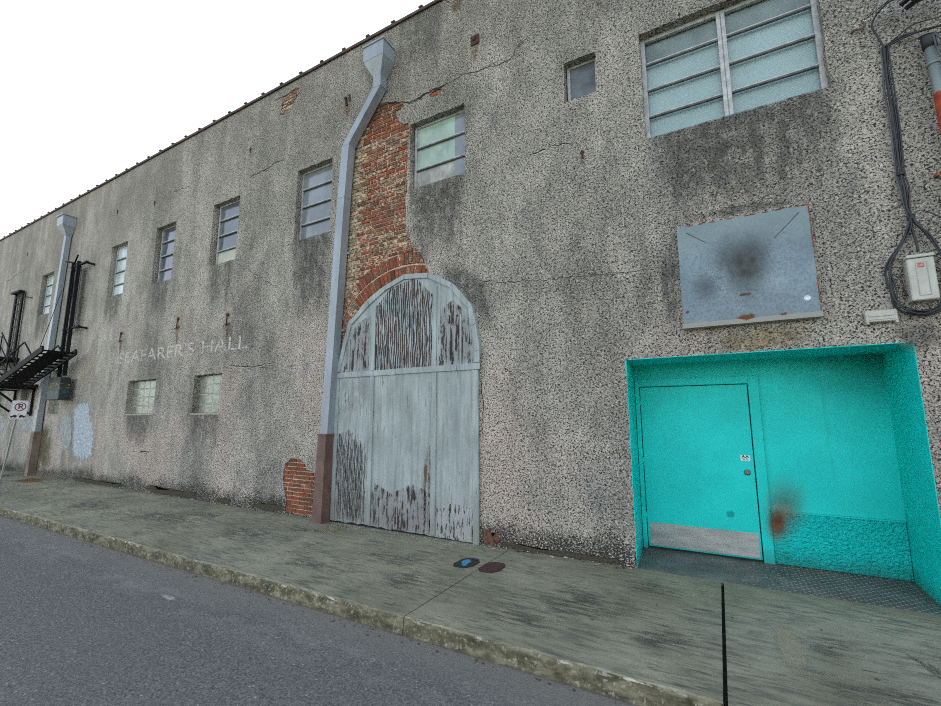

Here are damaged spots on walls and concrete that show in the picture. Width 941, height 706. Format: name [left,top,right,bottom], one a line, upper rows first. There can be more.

spalling [280,88,299,115]
crack [383,41,522,104]
crack [533,142,574,155]
damp [665,92,810,190]
rust [933,90,941,135]
spalling [340,102,472,412]
spalling [214,458,315,516]
rust [772,503,790,532]